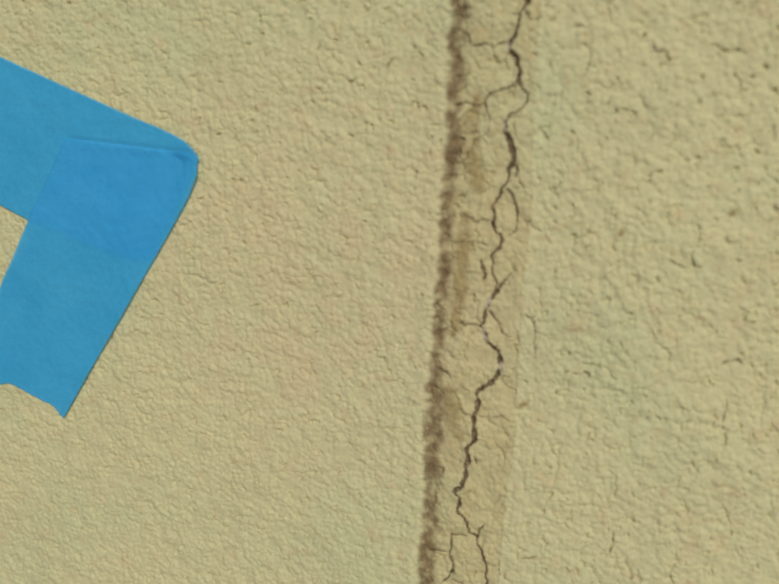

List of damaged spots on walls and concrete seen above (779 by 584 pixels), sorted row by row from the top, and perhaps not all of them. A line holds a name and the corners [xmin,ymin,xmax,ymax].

crack [430,0,531,584]